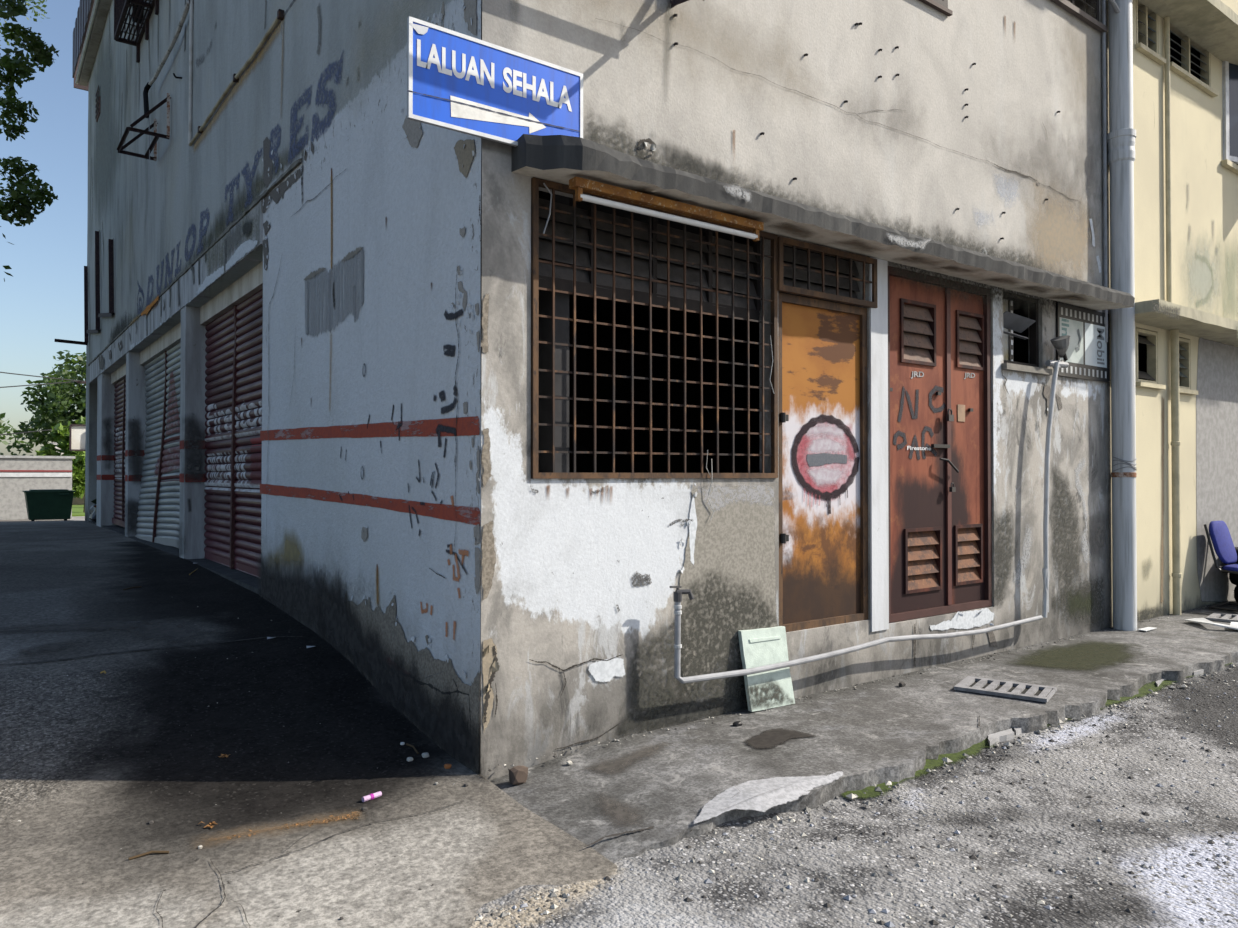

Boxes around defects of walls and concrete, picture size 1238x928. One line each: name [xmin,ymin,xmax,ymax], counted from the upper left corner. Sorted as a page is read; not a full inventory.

peeling [401,108,423,148]
peeling [454,139,475,178]
leakage [585,122,801,203]
crack [595,18,1081,203]
leakage [111,147,303,348]
leakage [860,217,1096,311]
peeling [631,571,652,587]
peeling [669,483,778,690]
leakage [994,513,1031,606]
leakage [1052,462,1105,629]
peeling [345,587,500,775]
crack [529,654,623,695]